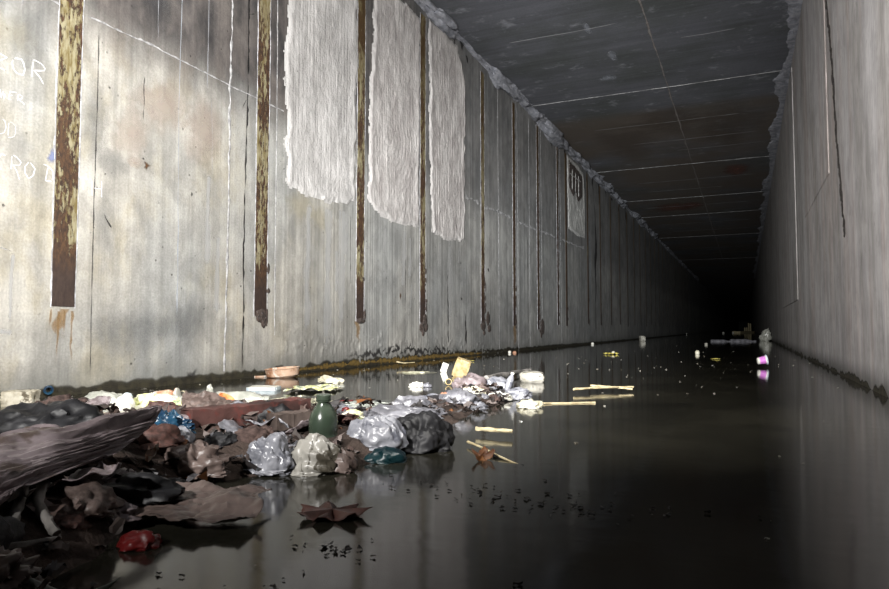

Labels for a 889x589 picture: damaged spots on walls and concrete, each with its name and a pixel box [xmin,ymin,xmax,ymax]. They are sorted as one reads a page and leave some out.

spalling [569,160,582,201]
rust [50,309,74,345]